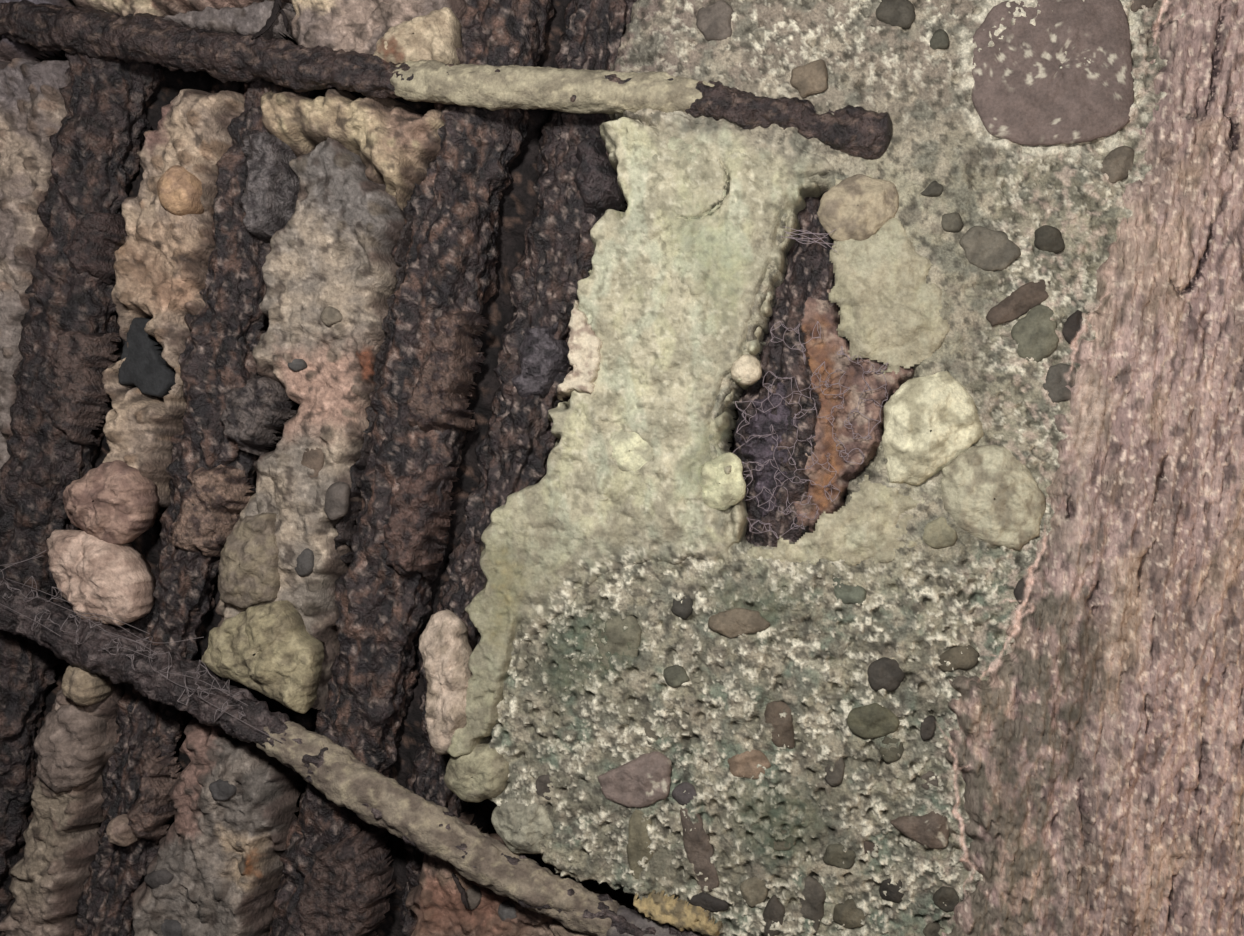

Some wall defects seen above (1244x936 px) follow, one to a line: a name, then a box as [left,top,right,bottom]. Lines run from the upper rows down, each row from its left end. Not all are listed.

spalling [0,0,556,67]
peeling [0,34,835,833]
spalling [486,0,1168,936]